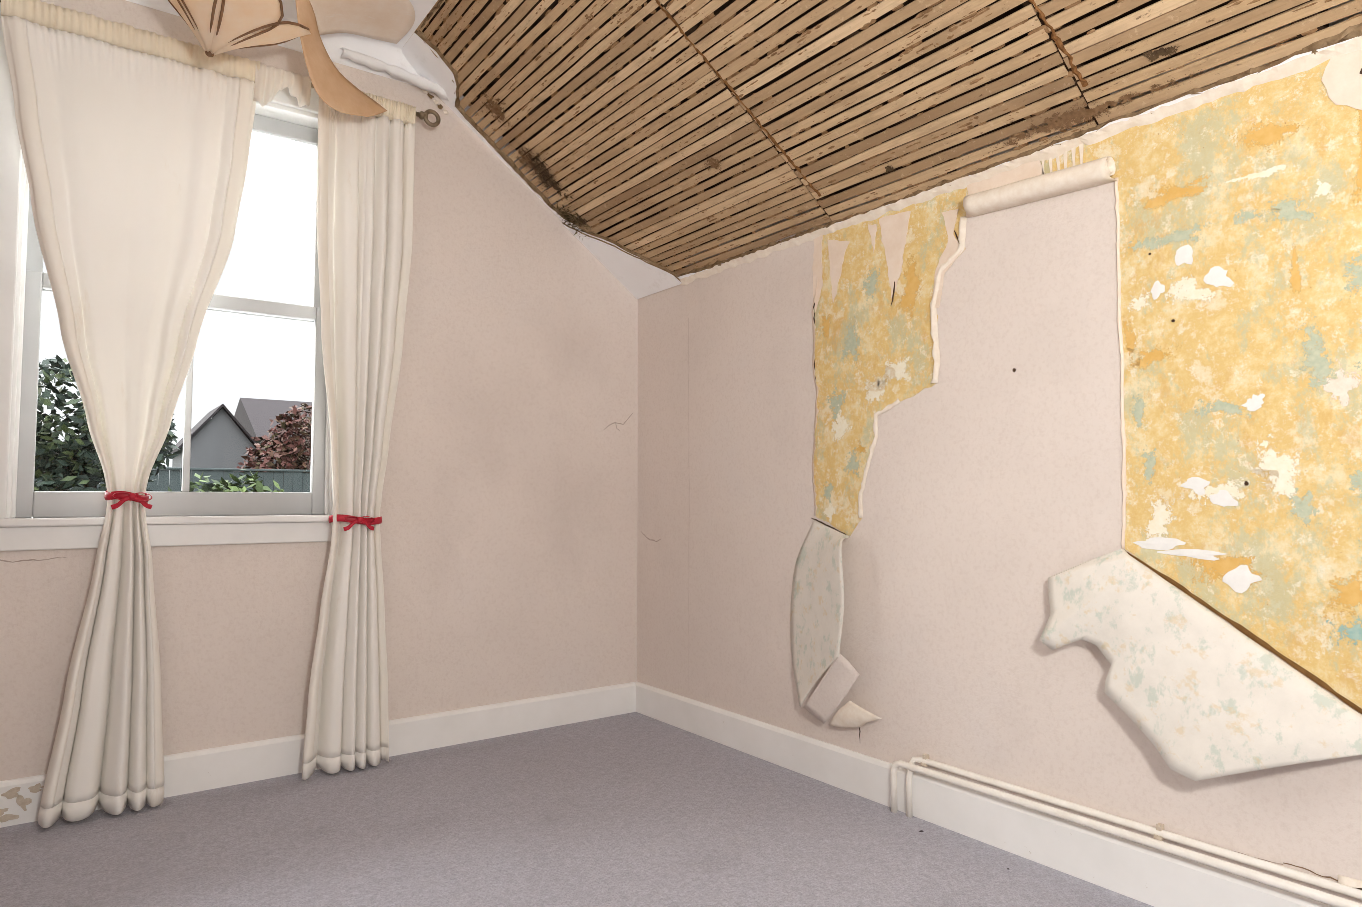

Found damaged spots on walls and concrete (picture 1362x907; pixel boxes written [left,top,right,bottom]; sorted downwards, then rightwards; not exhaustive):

flaking render [295,0,1362,781]
peeling [0,783,44,823]